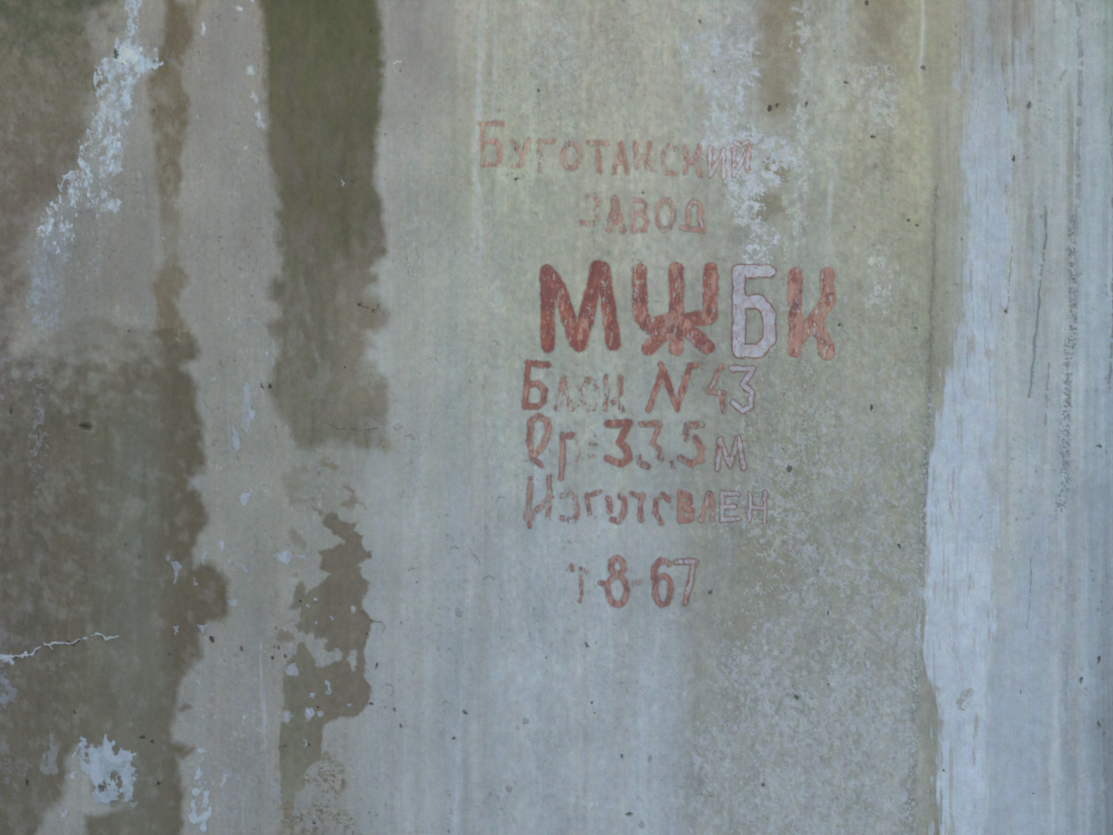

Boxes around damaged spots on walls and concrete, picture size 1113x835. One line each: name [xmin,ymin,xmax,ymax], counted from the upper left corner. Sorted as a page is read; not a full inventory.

leakage [0,0,236,835]
leakage [249,0,1110,835]
crack [0,620,119,715]
peeling [39,729,138,809]
leakage [214,483,376,835]